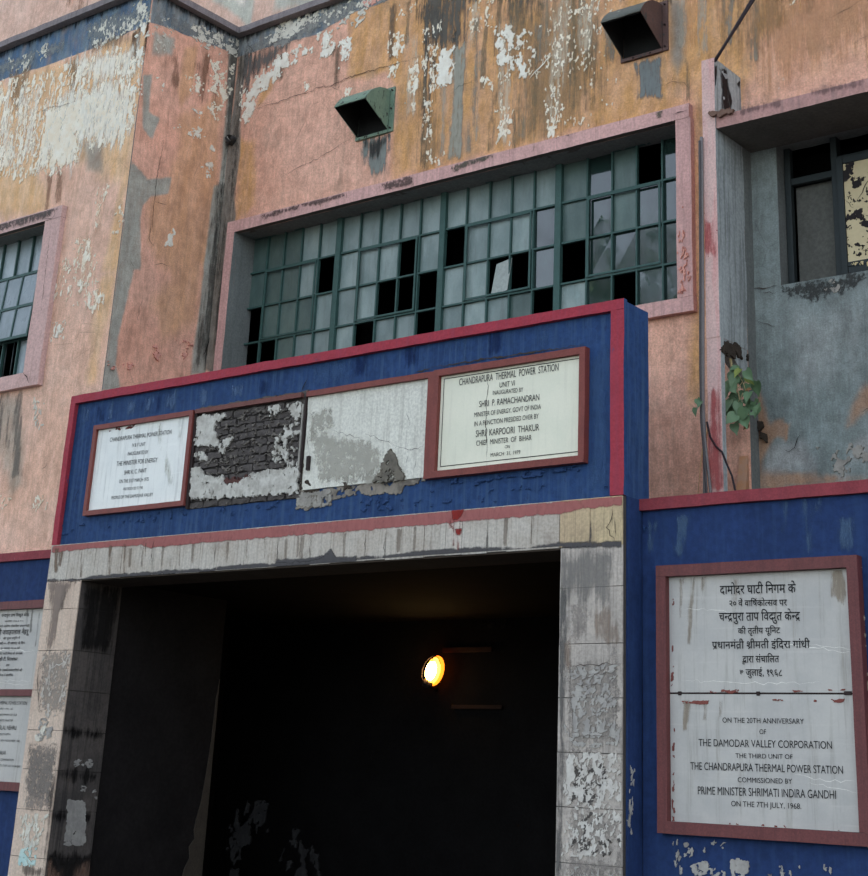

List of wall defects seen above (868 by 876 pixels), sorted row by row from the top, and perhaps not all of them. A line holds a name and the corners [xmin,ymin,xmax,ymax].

peeling [0,0,386,184]
flaking render [387,2,456,166]
damp [407,0,548,171]
peeling [469,0,612,146]
damp [567,0,615,106]
damp [634,58,663,98]
peeling [53,238,105,314]
flaking render [224,474,251,484]
flaking render [295,448,426,511]
peeling [18,845,37,867]
spalling [571,763,621,857]
peeling [627,765,635,835]